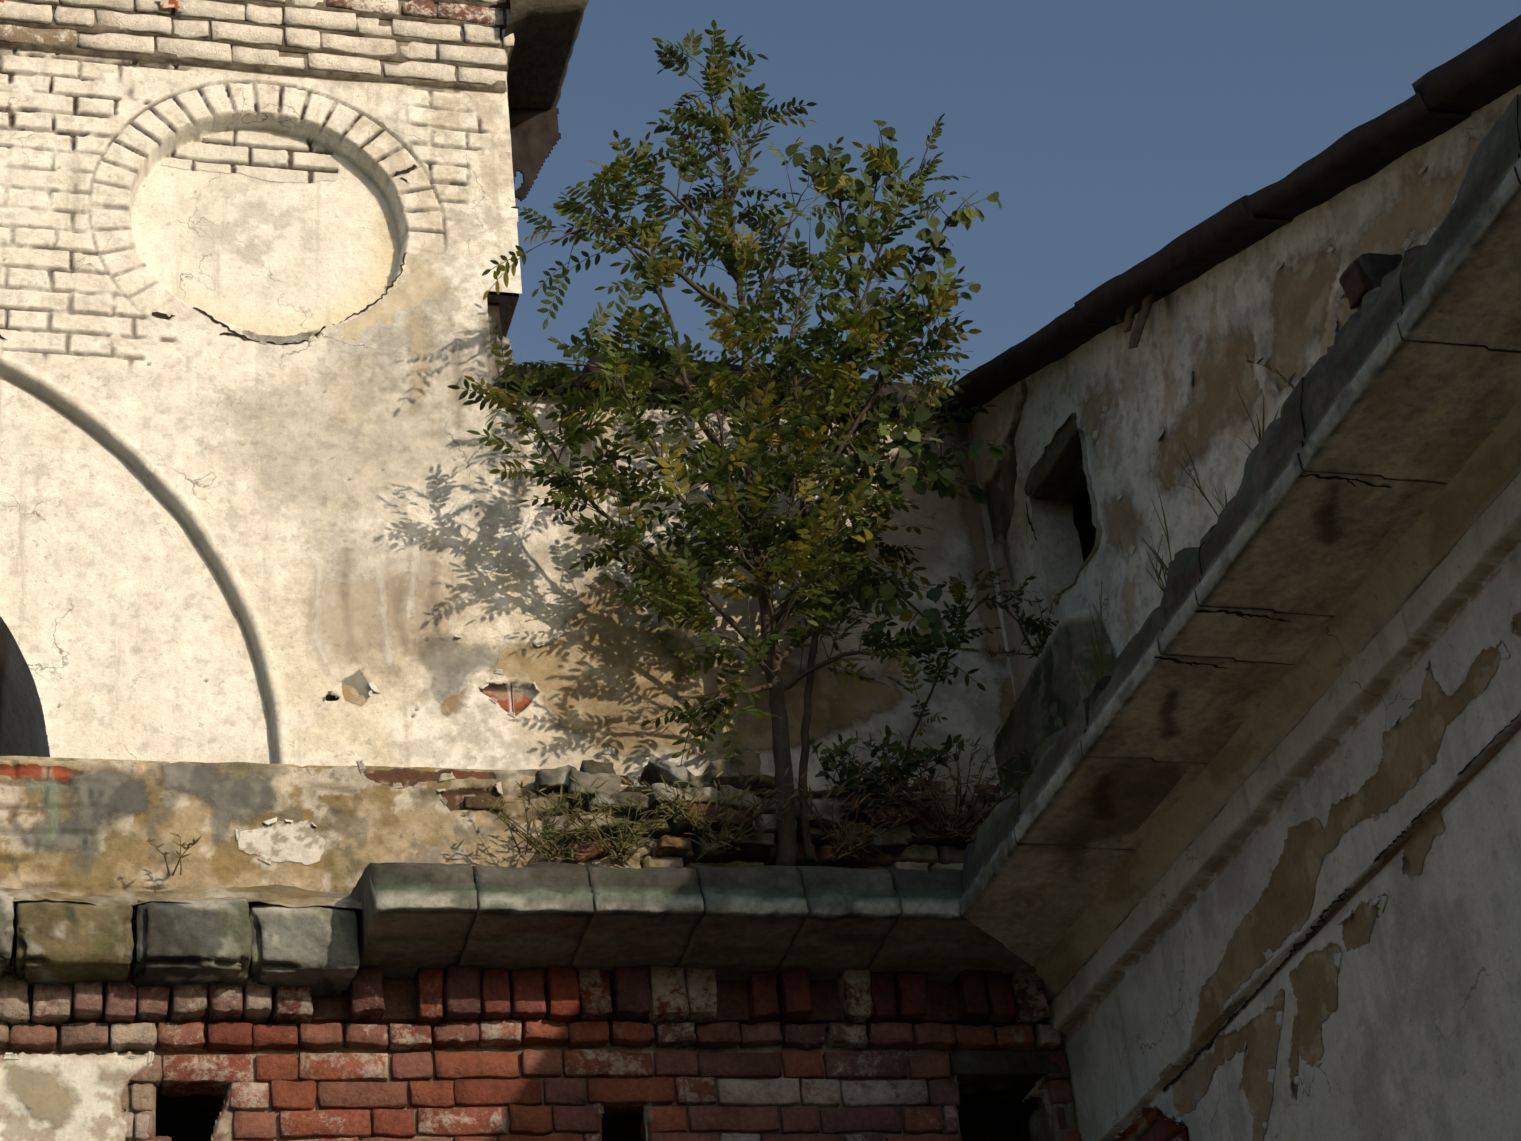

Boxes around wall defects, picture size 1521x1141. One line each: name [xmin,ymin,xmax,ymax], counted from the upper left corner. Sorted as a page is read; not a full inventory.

crack [152,252,407,345]
peeling [1154,115,1501,491]
peeling [1104,491,1142,558]
peeling [441,569,948,756]
peeling [235,817,326,865]
peeling [1110,613,1521,1141]
peeling [0,1051,155,1141]